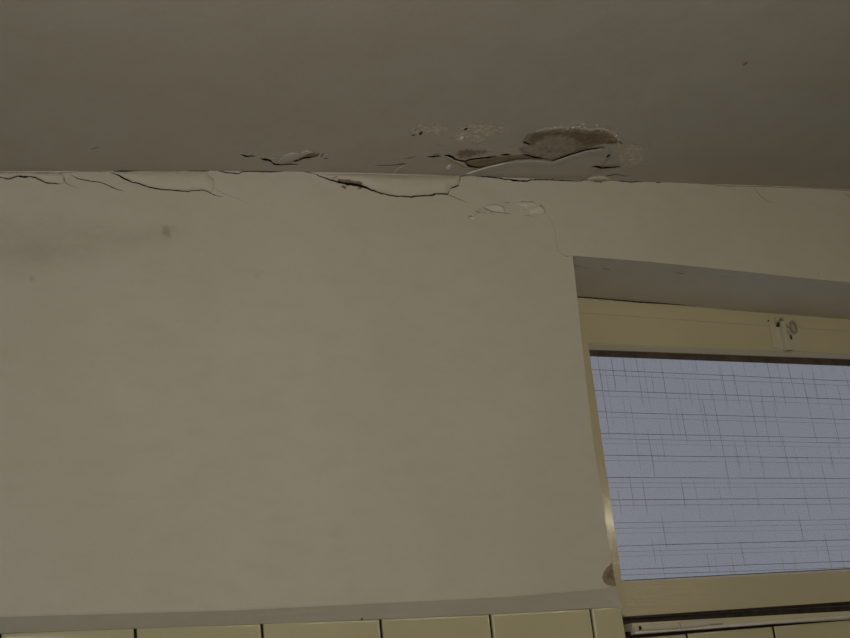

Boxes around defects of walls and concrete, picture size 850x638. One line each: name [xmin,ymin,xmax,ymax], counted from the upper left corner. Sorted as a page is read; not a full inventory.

peeling [240,150,328,165]
crack [376,144,441,166]
flaking render [445,122,623,169]
crack [0,171,284,203]
crack [308,148,661,203]